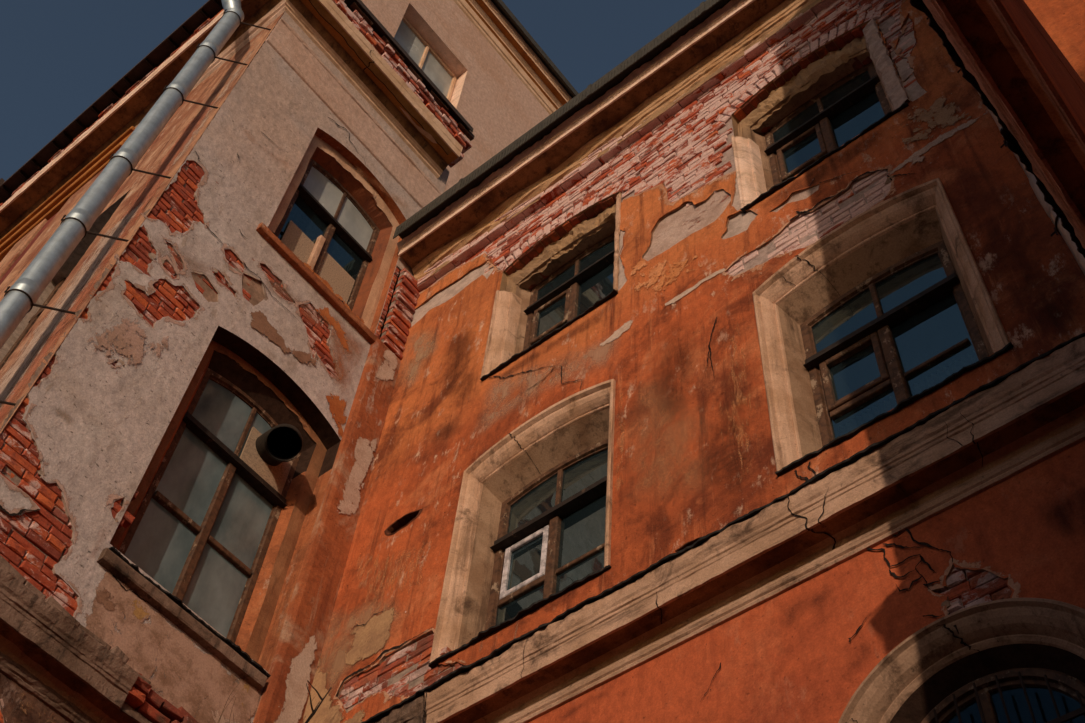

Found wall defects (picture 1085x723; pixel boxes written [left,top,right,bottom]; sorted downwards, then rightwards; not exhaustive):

flaking render [375,0,987,381]
peeling [0,50,339,723]
peeling [337,437,377,516]
spalling [384,508,423,536]
crack [787,461,836,550]
crack [867,529,994,673]
spalling [928,558,1021,616]
flaking render [274,607,466,723]